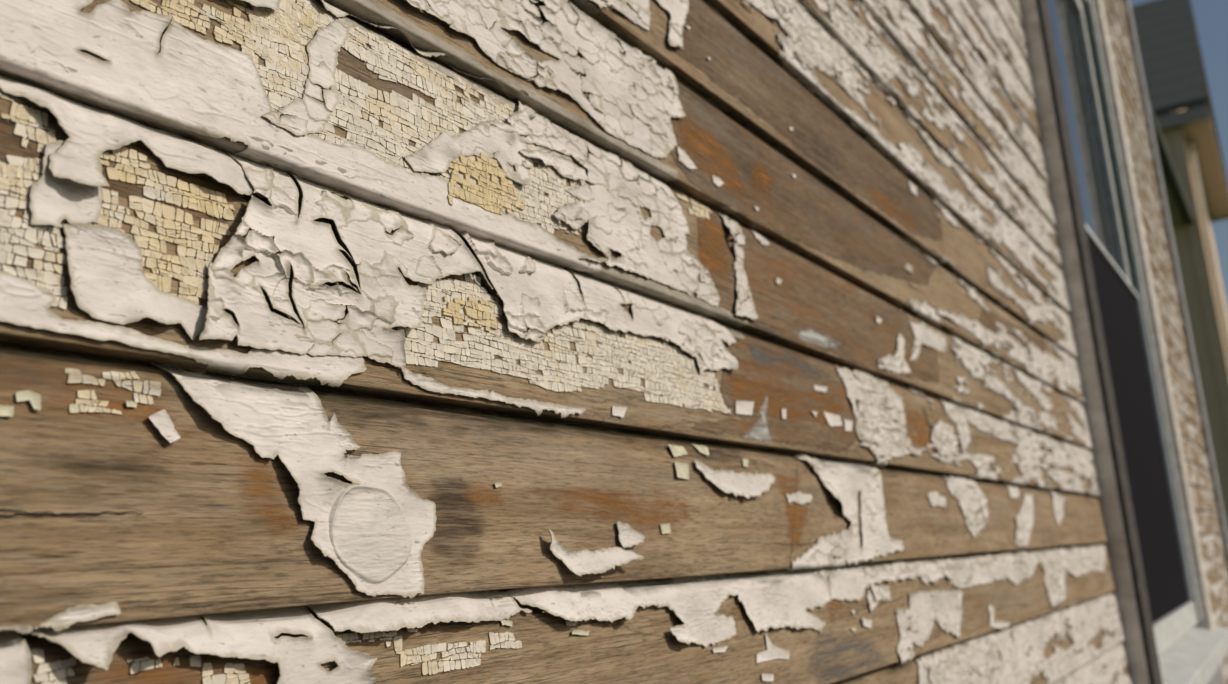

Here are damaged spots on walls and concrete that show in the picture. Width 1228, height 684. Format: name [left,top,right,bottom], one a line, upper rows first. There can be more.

crack [265,273,298,323]
crack [298,198,357,292]
crack [473,271,496,301]
peeling [656,0,1100,526]
peeling [0,329,1132,684]